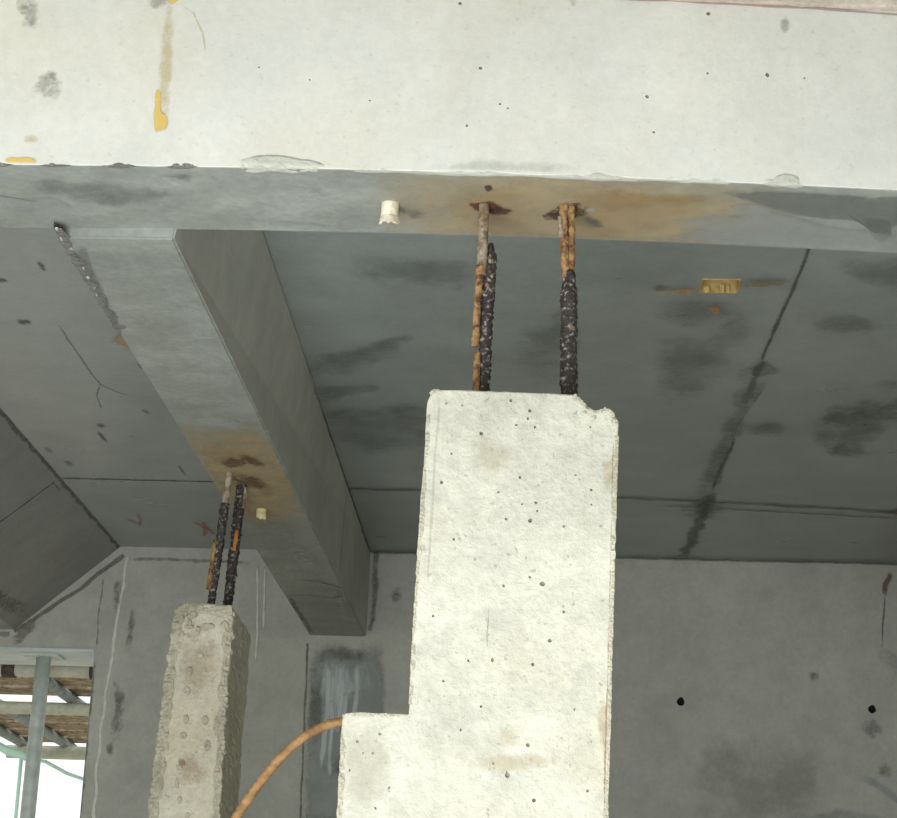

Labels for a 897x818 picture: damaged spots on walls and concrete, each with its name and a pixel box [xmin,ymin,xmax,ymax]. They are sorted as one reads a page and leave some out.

spalling [53,221,126,335]
rust [439,177,732,241]
crack [743,249,810,403]
rust [199,437,295,517]
crack [0,410,226,818]
leakage [306,650,383,818]